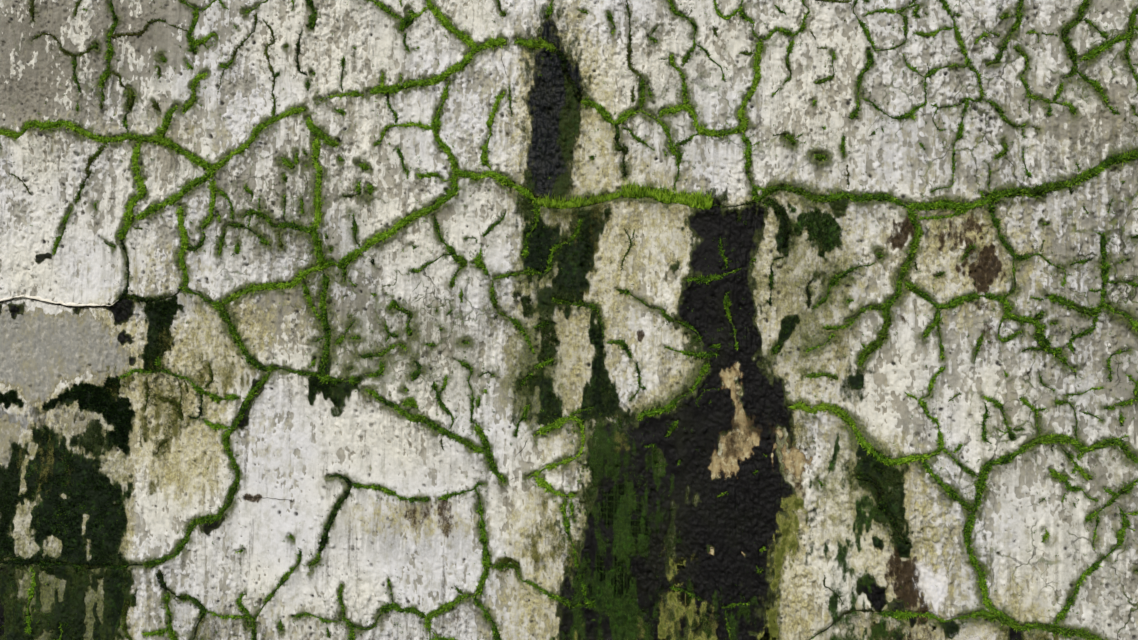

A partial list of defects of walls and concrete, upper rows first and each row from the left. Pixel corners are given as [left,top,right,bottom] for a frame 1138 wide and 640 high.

crack [0,0,756,572]
damp [510,4,914,640]
crack [24,566,36,634]
damp [0,376,137,640]
crack [120,601,135,640]
crack [141,550,302,640]
crack [291,407,595,640]
crack [669,586,750,640]
crack [790,366,1138,640]